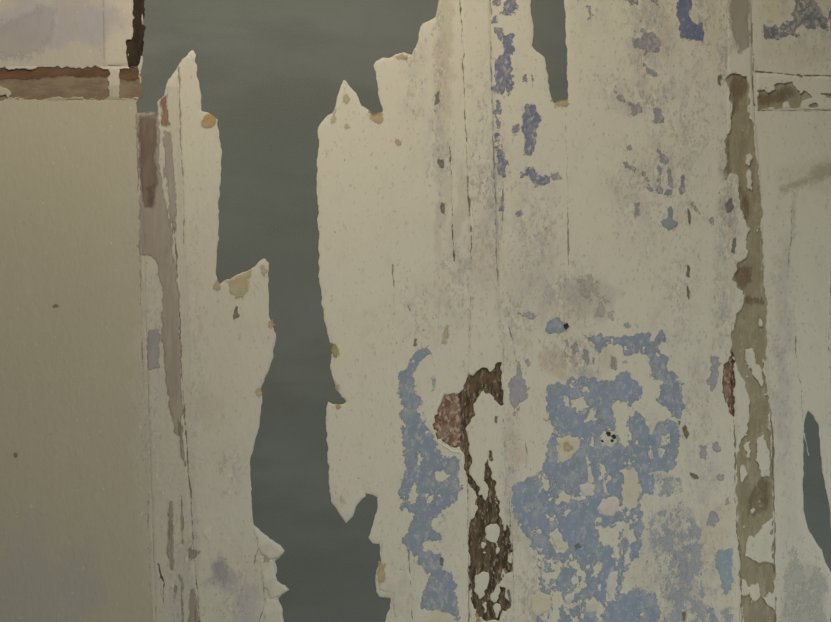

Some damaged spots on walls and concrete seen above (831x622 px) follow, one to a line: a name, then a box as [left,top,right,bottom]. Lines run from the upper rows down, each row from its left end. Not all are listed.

peeling [0,0,289,622]
peeling [317,0,831,622]